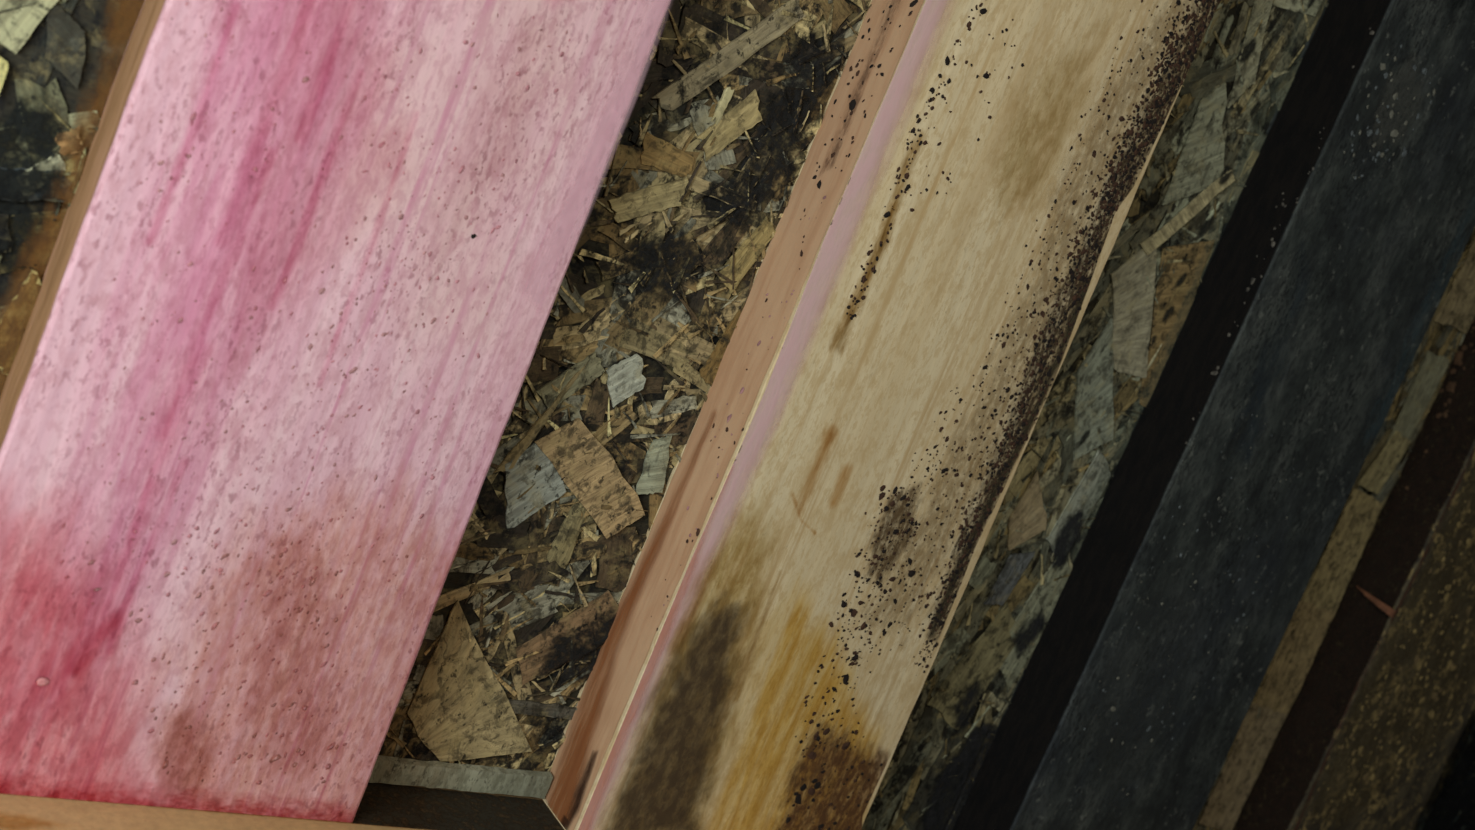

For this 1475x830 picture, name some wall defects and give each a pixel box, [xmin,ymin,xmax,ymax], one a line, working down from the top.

water stain [0,0,251,448]
water stain [353,0,1024,830]
water stain [923,0,1435,830]
water stain [1232,318,1475,830]